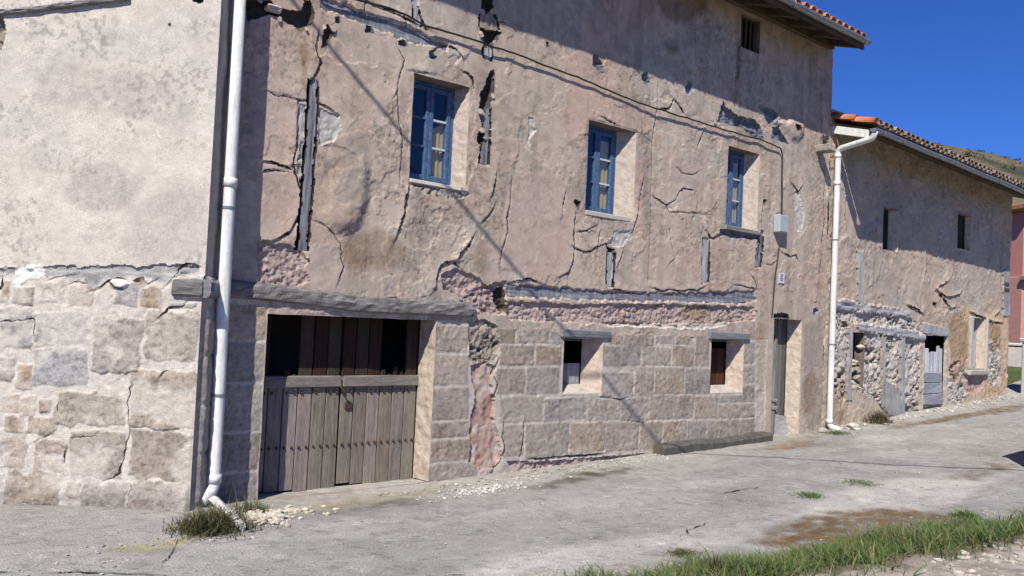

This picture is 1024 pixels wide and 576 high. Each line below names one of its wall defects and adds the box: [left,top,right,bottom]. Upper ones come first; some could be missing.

peeling [296,103,342,190]
crack [365,0,474,237]
spalling [713,101,789,145]
crack [47,263,198,289]
spalling [256,238,311,289]
crack [263,135,344,278]
crack [436,183,512,280]
crack [907,281,1001,324]
spalling [441,267,758,472]
spalling [834,307,925,413]
spalling [948,337,1002,405]
crack [103,384,132,495]